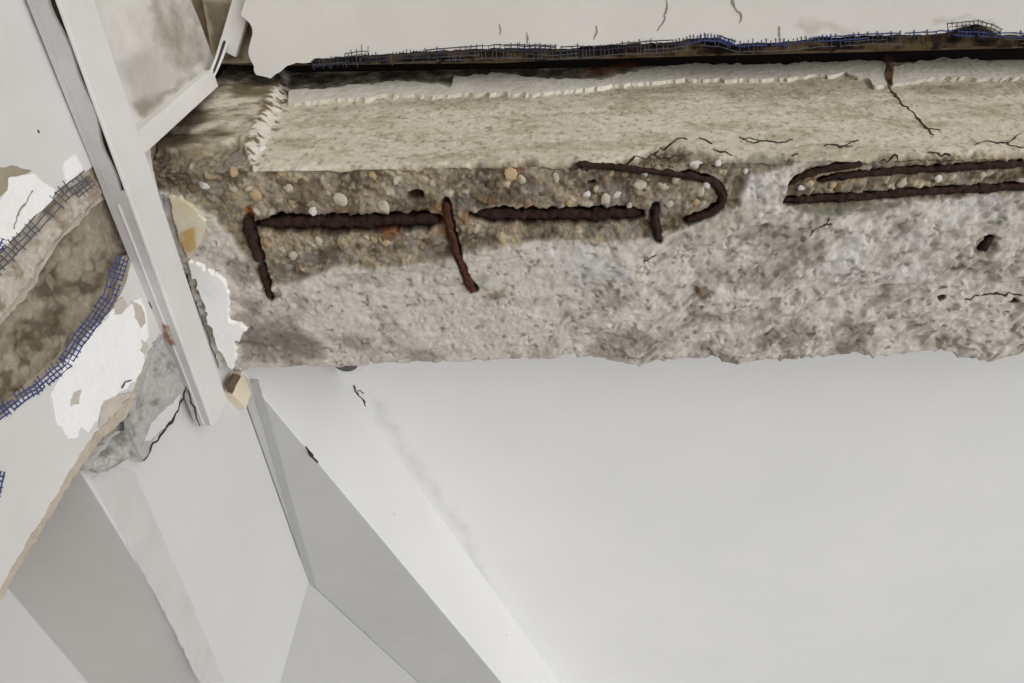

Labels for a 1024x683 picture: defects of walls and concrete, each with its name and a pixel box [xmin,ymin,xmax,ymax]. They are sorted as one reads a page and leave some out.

peeling [0,154,83,248]
spalling [152,139,1024,287]
crack [626,137,798,165]
crack [885,57,951,157]
peeling [0,297,184,601]
crack [143,387,200,461]